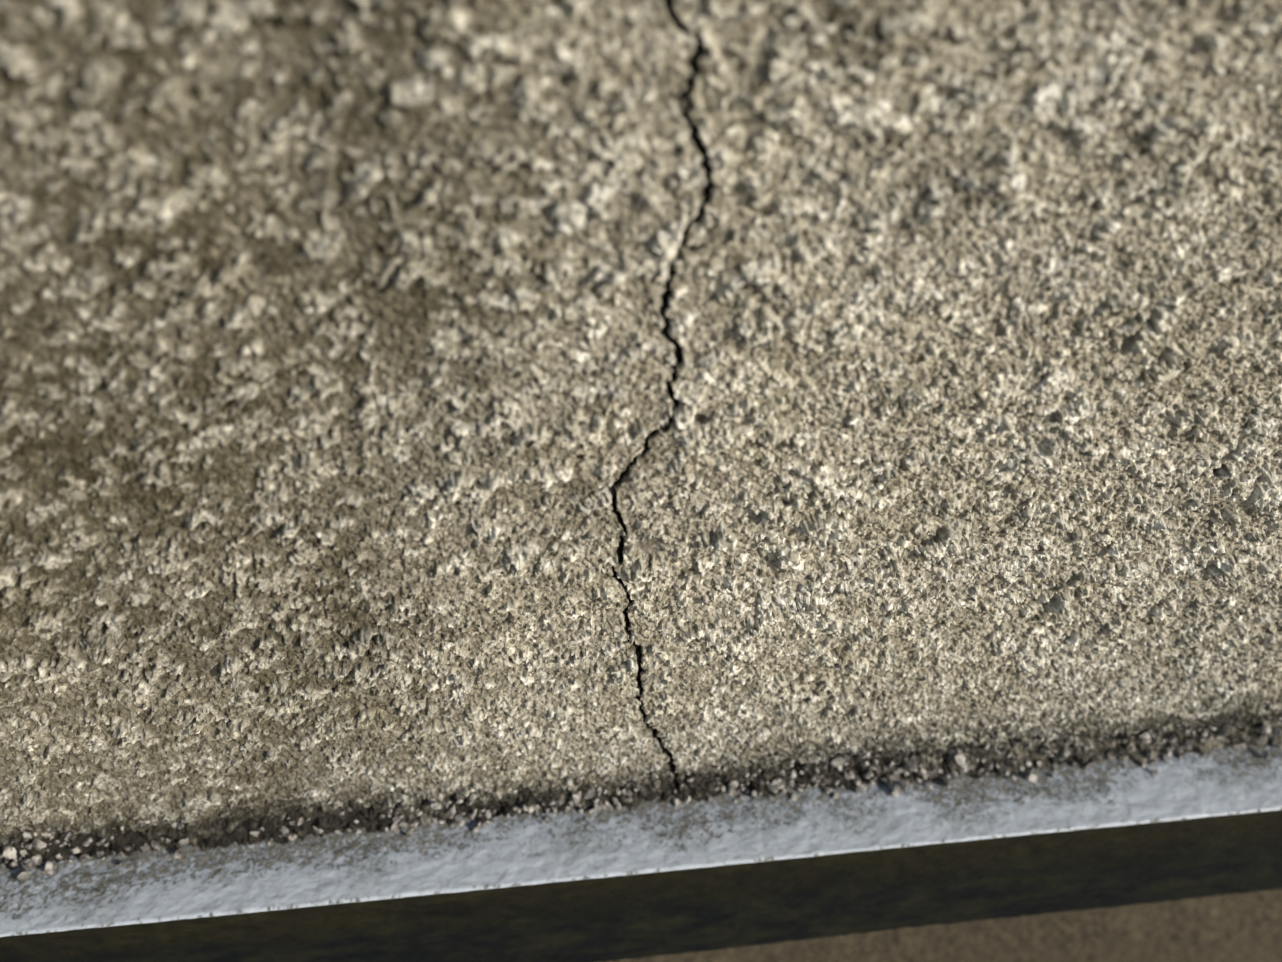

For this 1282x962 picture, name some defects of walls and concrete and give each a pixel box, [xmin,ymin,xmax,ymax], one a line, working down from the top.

crack [609,0,718,787]